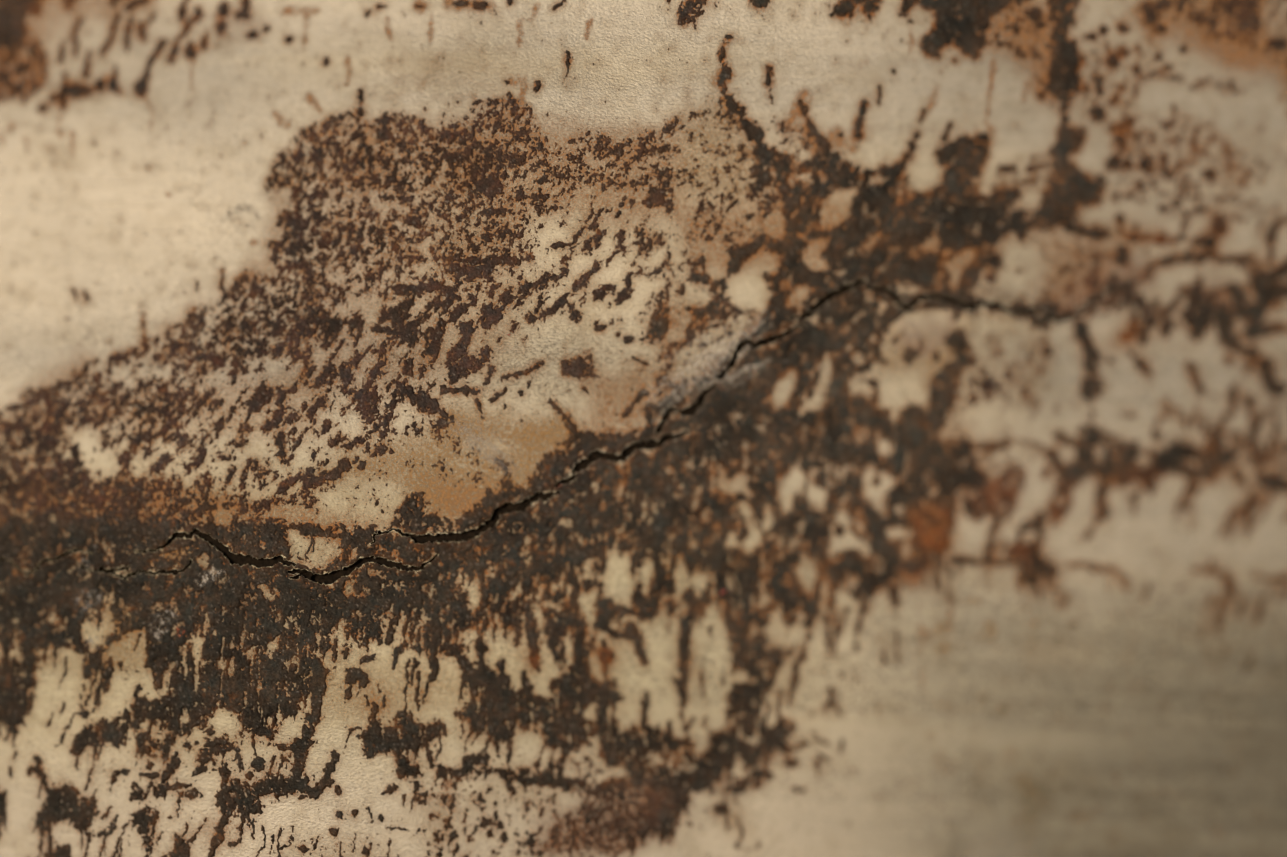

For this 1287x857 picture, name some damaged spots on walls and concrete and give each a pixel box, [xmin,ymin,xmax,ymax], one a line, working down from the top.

rust [364,0,592,40]
rust [0,0,329,193]
rust [57,277,108,320]
crack [0,278,1133,585]
rust [1188,557,1236,635]
rust [810,687,843,717]